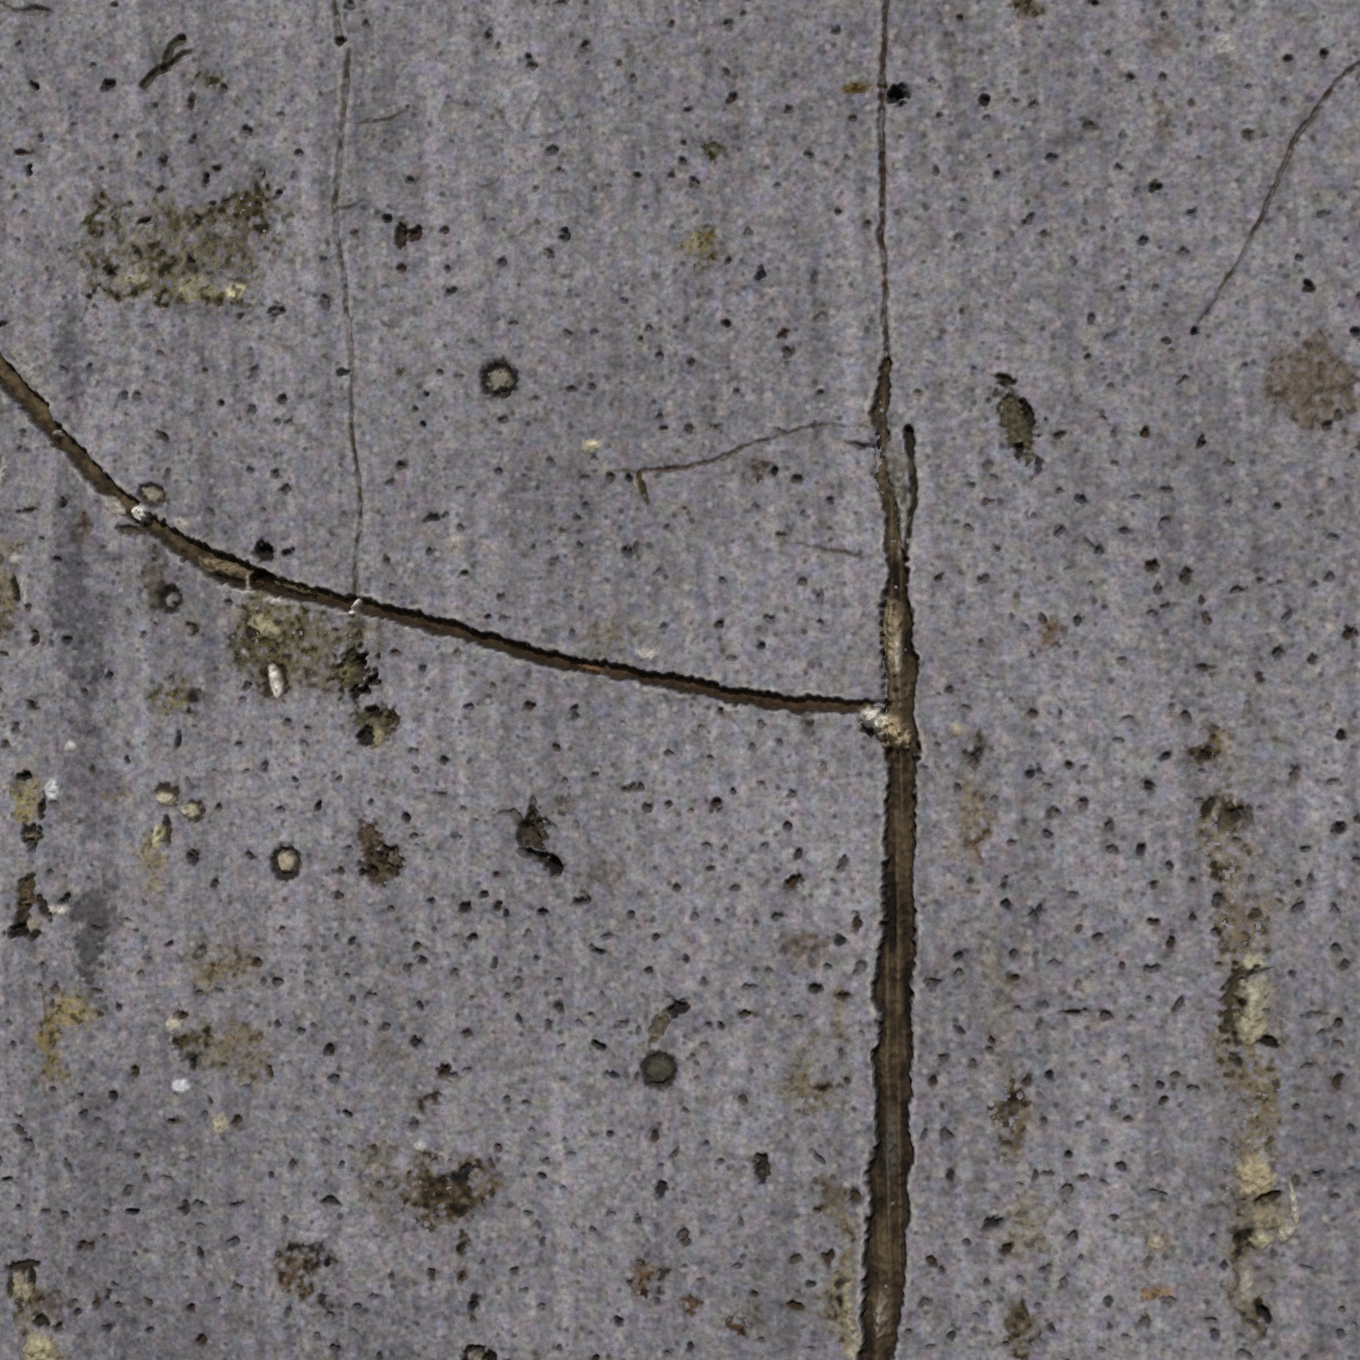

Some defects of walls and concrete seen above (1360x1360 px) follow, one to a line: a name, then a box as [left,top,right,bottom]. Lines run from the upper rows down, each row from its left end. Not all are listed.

crack [1194,59,1360,327]
crack [0,0,962,1360]
water stain [1238,1263,1256,1306]